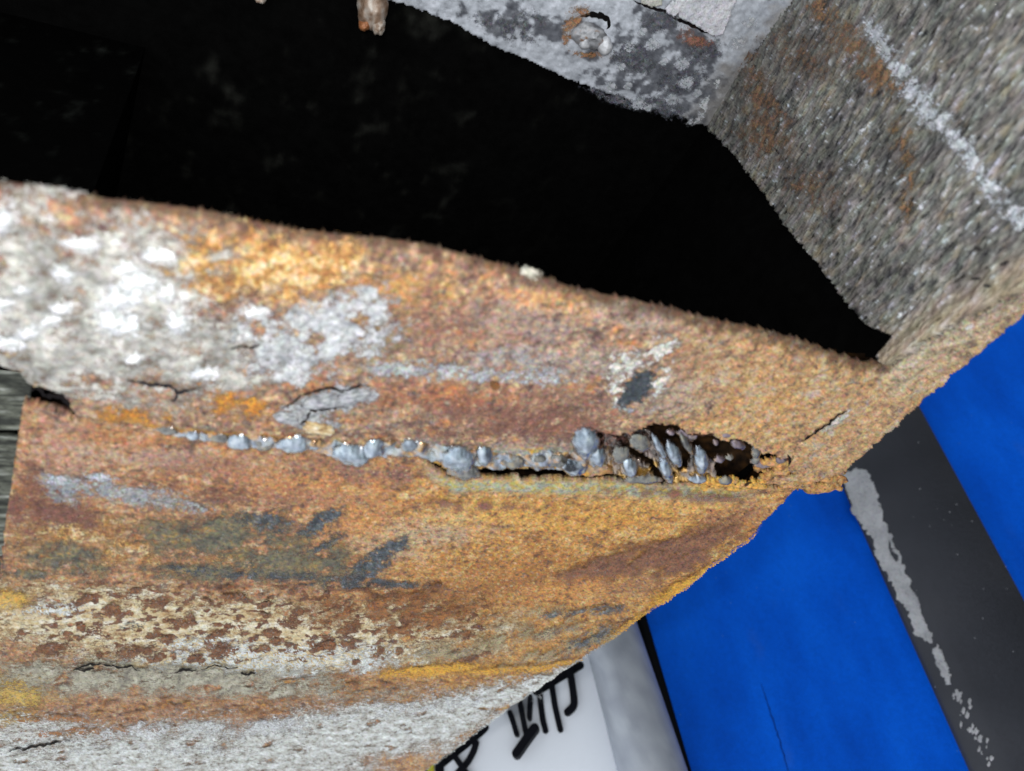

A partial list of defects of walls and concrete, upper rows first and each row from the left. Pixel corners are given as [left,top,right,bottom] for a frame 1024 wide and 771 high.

rust [160,218,373,321]
peeling [0,179,412,436]
rust [94,404,150,425]
rust [210,390,284,422]
rust [406,397,620,445]
rust [7,461,163,573]
rust [417,500,529,514]
rust [569,487,745,504]
rust [531,511,756,642]
crack [72,663,139,672]
crack [176,664,256,676]
rust [0,575,583,738]